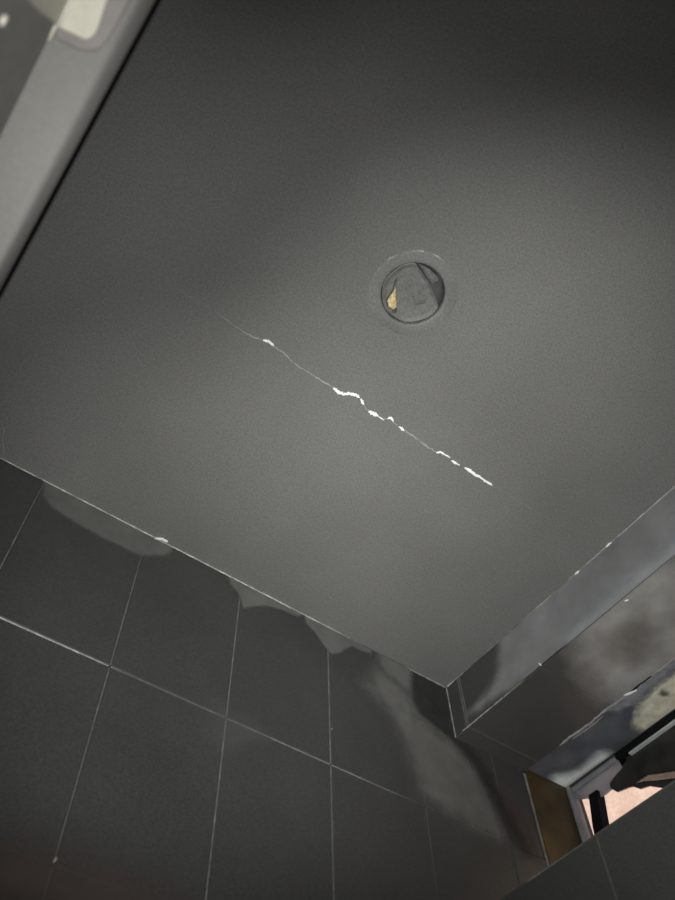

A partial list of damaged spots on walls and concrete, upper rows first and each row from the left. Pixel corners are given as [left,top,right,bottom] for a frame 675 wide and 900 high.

crack [165,277,538,514]